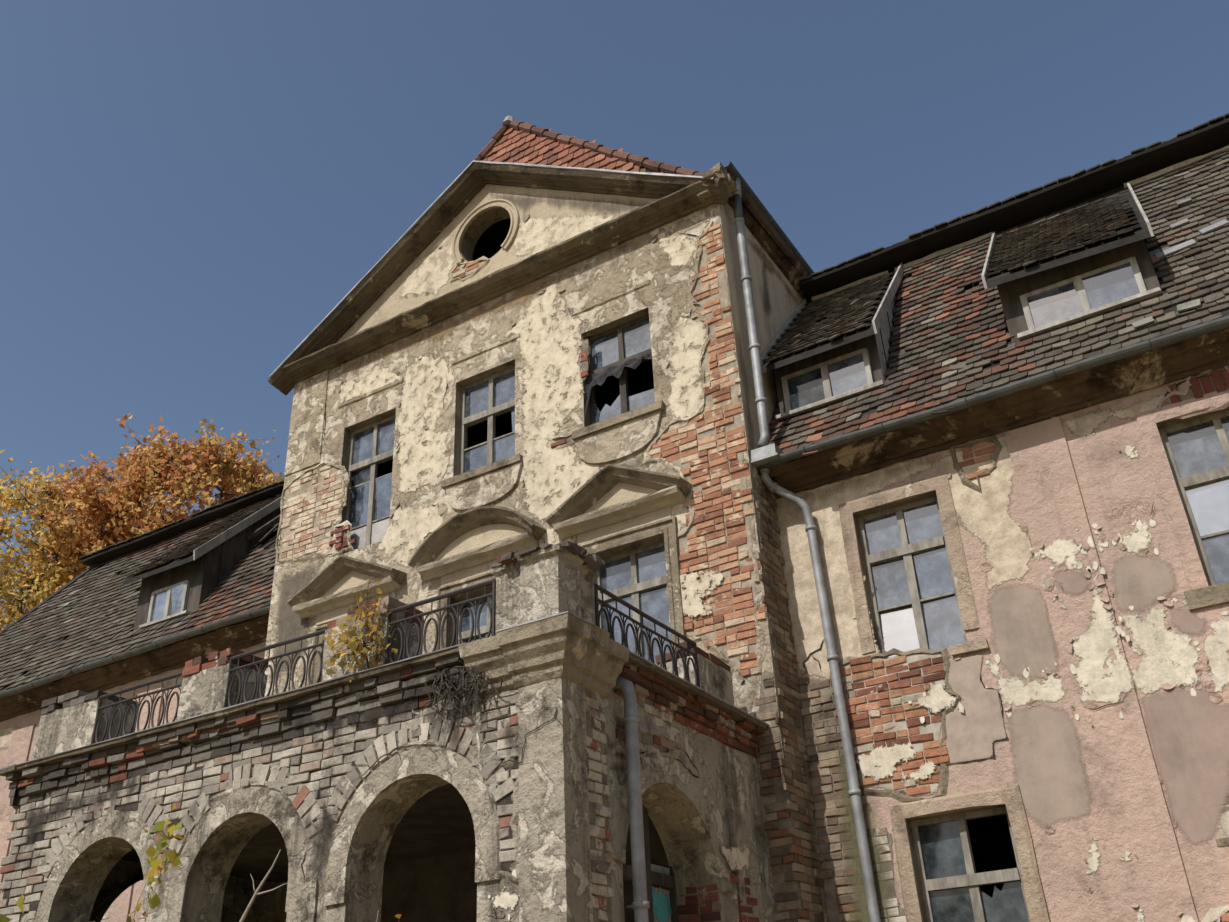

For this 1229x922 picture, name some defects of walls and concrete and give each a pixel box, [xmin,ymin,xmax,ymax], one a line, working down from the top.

flaking render [400,243,490,299]
flaking render [513,212,616,257]
flaking render [338,356,455,570]
flaking render [504,283,603,548]
spalling [640,216,1229,922]
spalling [0,689,519,922]